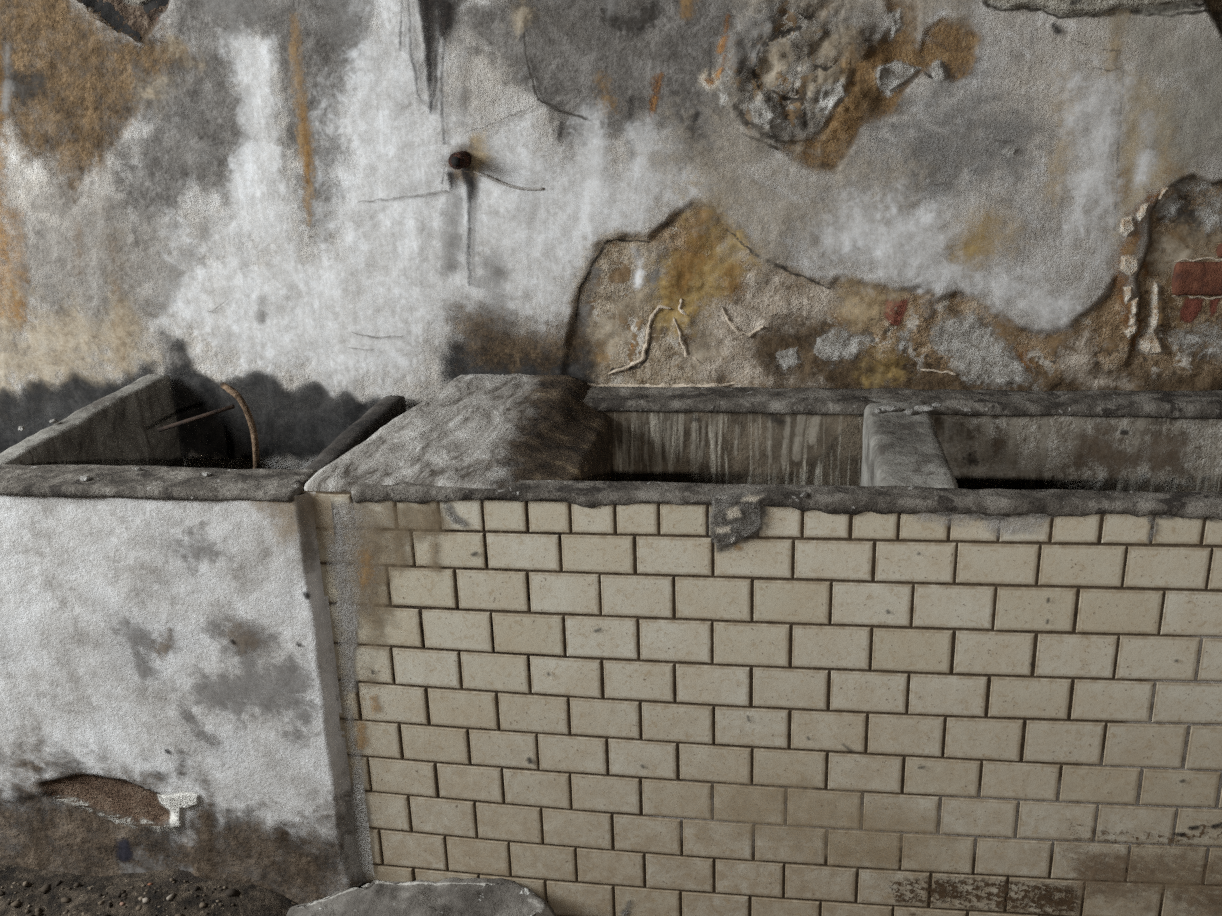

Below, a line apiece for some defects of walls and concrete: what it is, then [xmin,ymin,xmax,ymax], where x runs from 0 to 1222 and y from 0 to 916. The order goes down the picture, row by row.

crack [476,27,587,129]
peeling [784,0,980,172]
leakage [0,0,1080,396]
peeling [569,174,1222,392]
peeling [715,495,761,534]
spalling [42,774,201,833]
leakage [0,711,370,904]